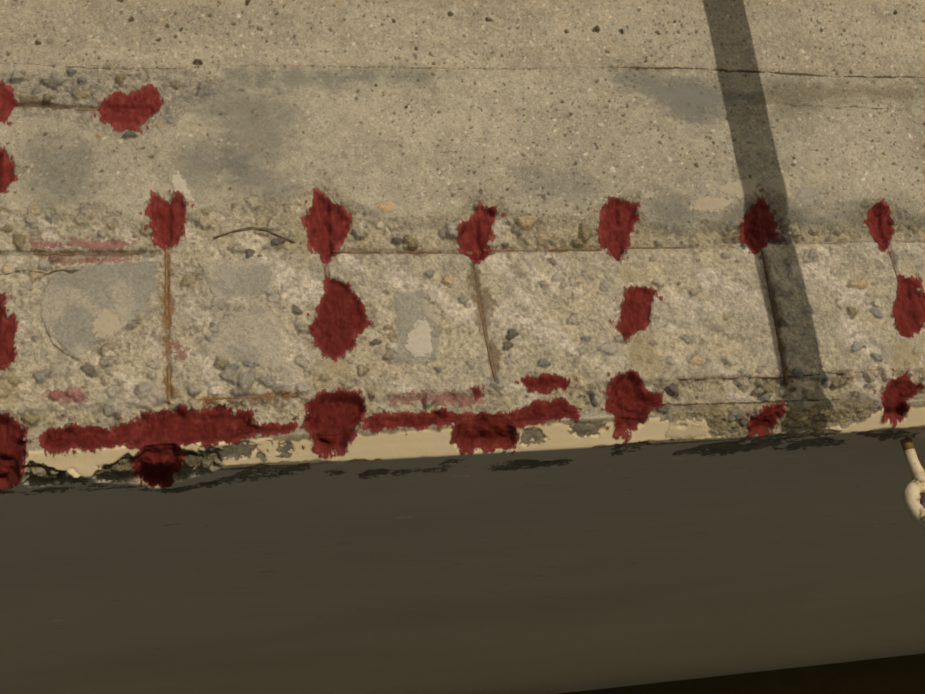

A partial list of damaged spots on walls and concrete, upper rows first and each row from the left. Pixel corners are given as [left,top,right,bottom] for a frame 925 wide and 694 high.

crack [621,66,924,78]
rust [161,284,173,355]
spalling [0,171,925,495]